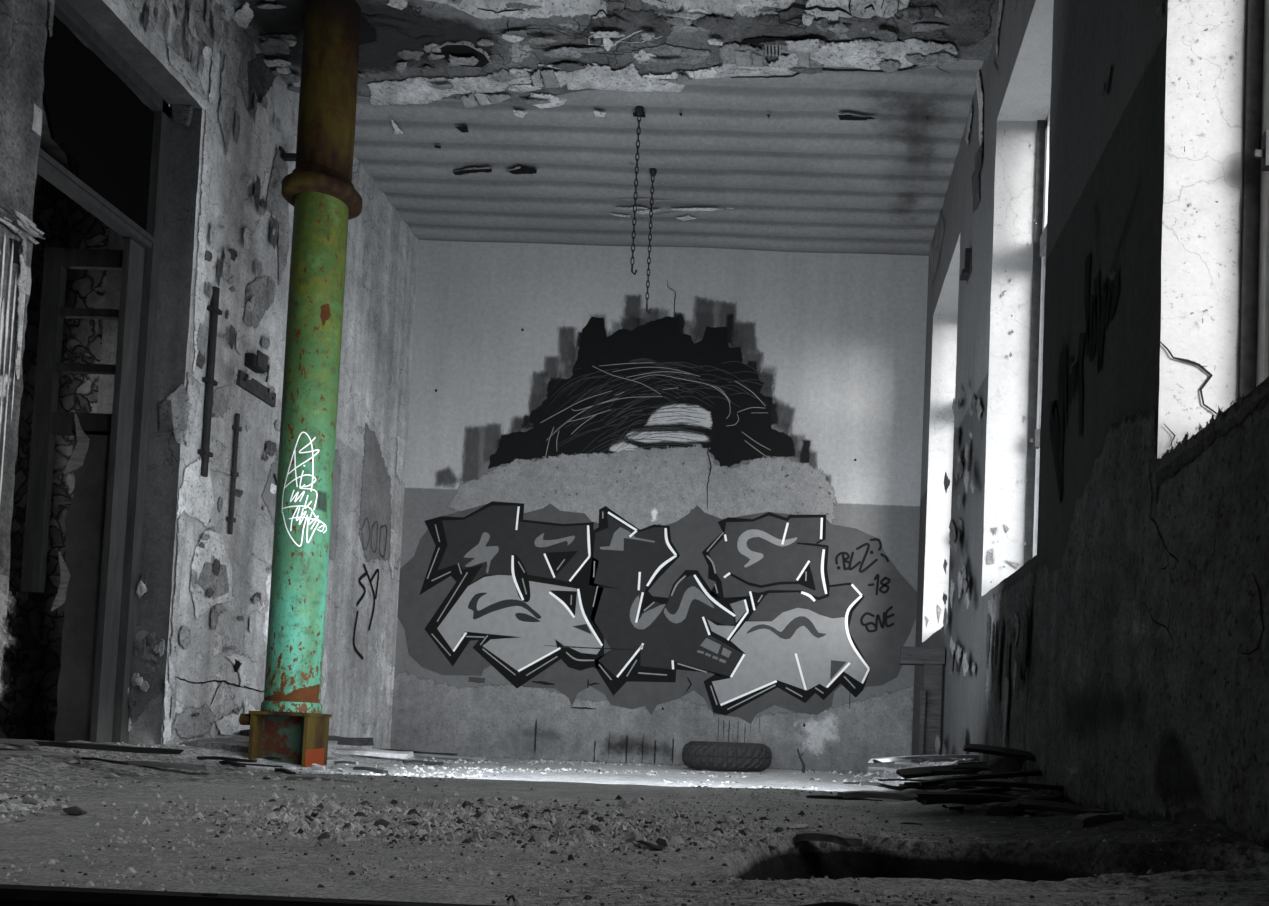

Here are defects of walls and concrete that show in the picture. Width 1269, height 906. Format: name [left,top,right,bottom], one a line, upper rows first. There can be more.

flaking render [358,0,1003,118]
peeling [965,70,983,212]
peeling [610,208,733,221]
peeling [10,230,27,380]
flaking render [127,0,306,745]
crack [1159,341,1217,415]
peeling [389,528,397,578]
peeling [446,443,838,530]
crack [1143,424,1179,643]
peeling [925,382,1269,848]
corrosion [265,684,320,703]
corrosion [305,748,324,767]